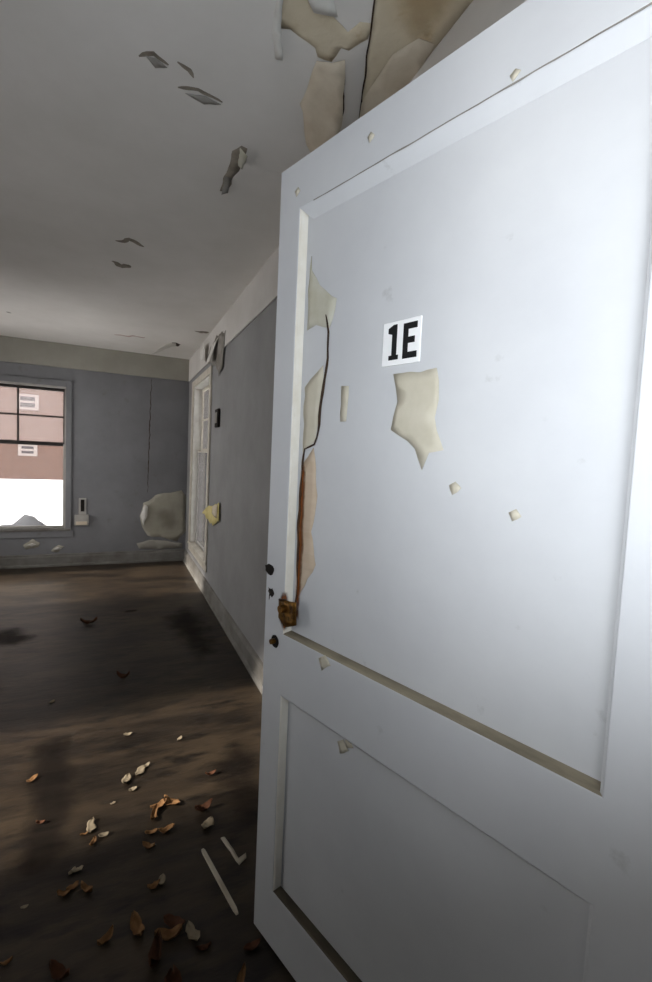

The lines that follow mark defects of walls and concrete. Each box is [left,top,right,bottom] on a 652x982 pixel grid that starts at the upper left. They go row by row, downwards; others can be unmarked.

peeling [272,0,473,153]
peeling [220,146,248,195]
peeling [307,256,337,330]
peeling [391,368,443,469]
peeling [137,490,186,549]
peeling [202,503,219,526]
peeling [299,366,324,595]